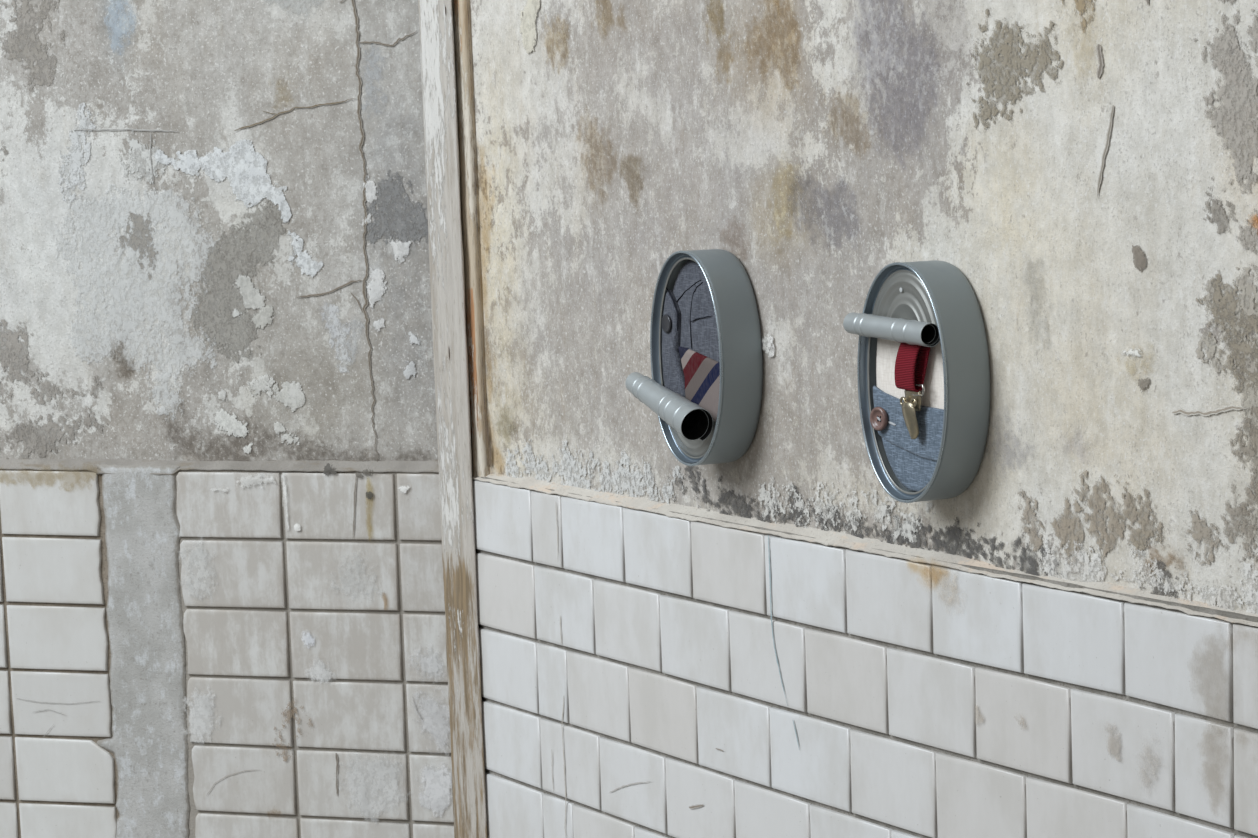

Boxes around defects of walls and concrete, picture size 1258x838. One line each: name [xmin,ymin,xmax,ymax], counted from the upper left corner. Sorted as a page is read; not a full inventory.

peeling [1,0,65,91]
peeling [966,9,1063,130]
crack [234,0,417,534]
peeling [1132,245,1146,271]
peeling [1181,0,1258,565]
peeling [1121,348,1150,391]
corrosion [483,383,491,466]
damp [505,439,1258,614]
peeling [1017,470,1165,575]